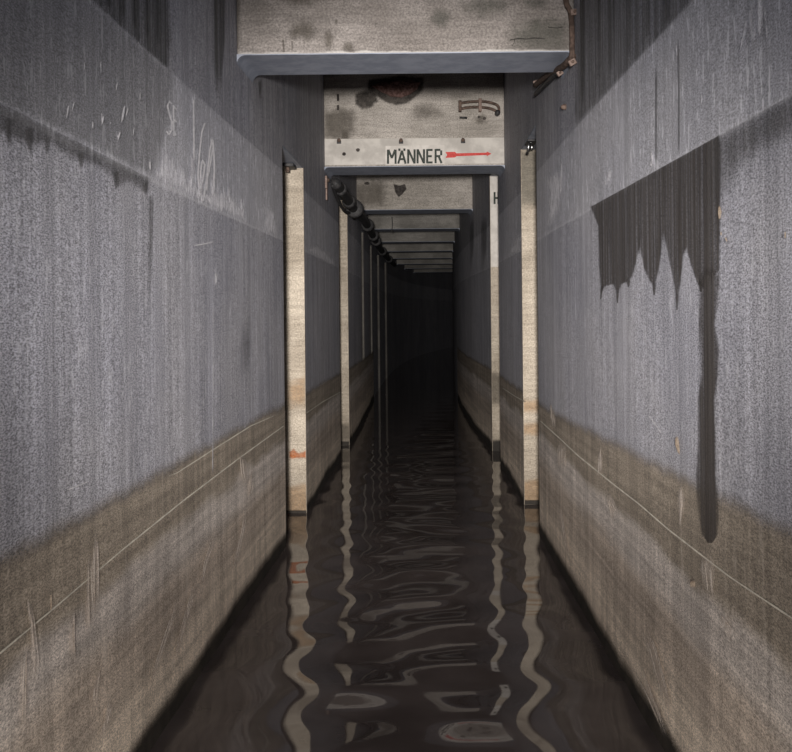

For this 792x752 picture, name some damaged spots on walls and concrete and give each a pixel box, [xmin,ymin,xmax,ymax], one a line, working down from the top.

leakage [1,109,102,164]
leakage [149,151,243,218]
leakage [457,133,792,752]